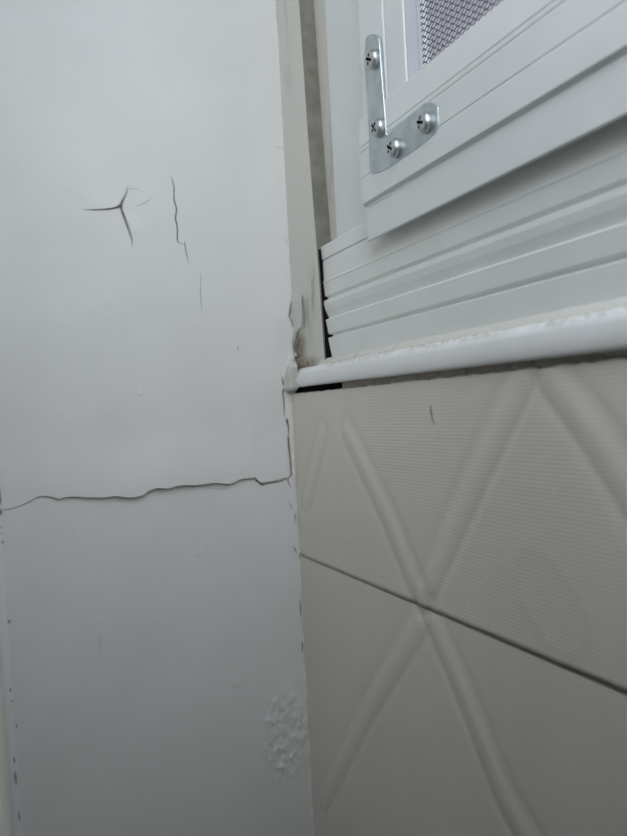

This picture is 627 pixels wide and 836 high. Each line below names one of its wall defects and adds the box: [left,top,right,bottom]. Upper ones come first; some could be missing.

crack [172,180,187,255]
crack [289,294,305,358]
crack [0,416,292,543]